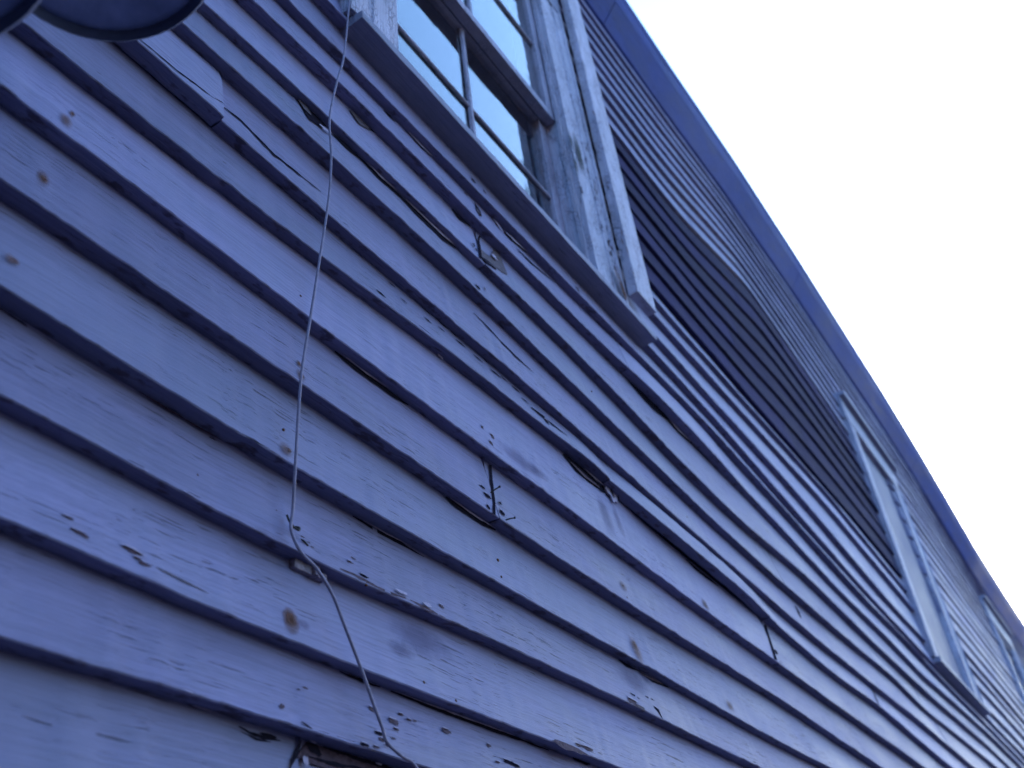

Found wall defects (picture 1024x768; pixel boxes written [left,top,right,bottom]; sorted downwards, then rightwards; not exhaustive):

crack [141,40,320,191]
crack [531,407,610,498]
crack [446,465,516,530]
peeling [61,513,90,539]
rust [284,610,298,629]
peeling [301,712,417,748]
spalling [552,739,593,765]